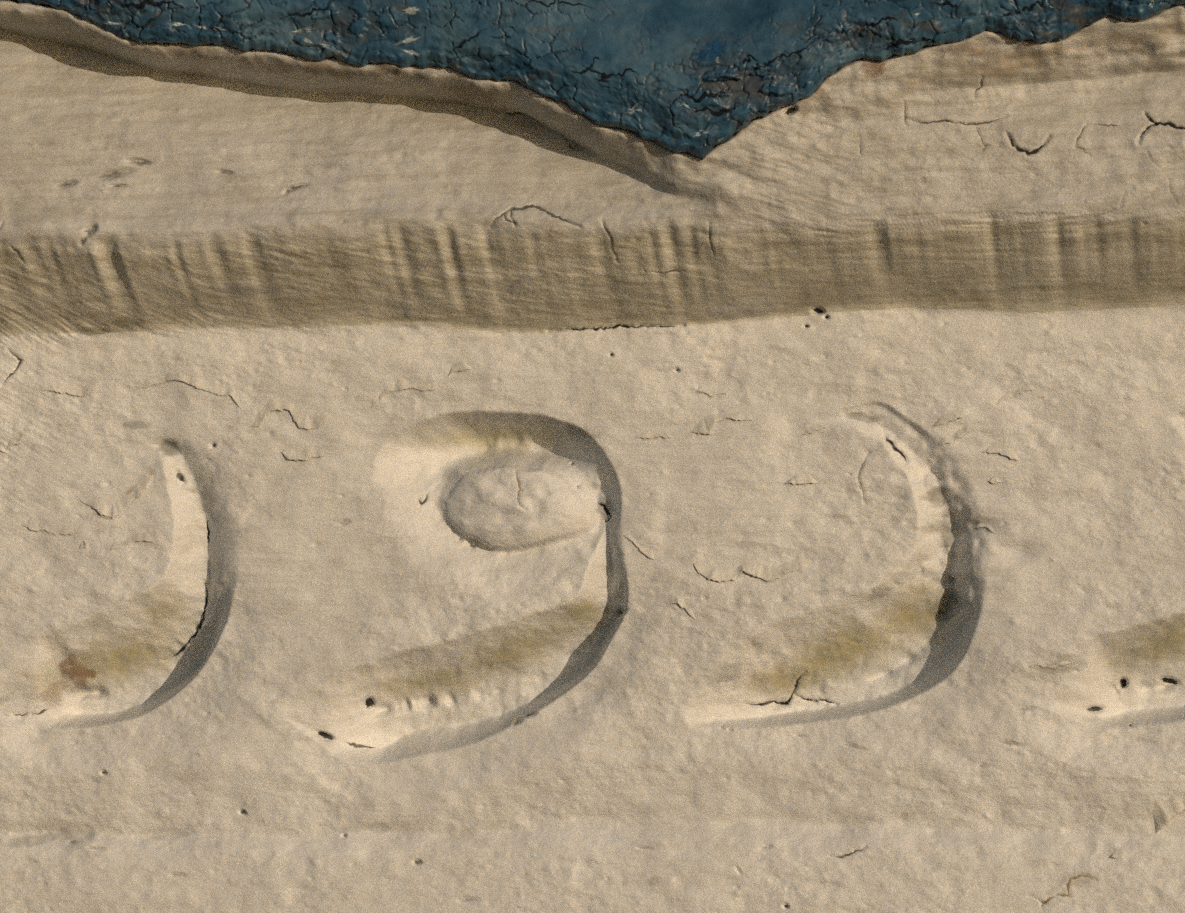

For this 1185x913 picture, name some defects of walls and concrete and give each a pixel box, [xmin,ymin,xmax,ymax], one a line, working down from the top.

crack [107,0,184,9]
crack [288,6,329,17]
crack [527,0,589,8]
crack [933,0,959,18]
crack [1001,0,1045,17]
crack [454,32,511,56]
crack [863,16,935,50]
crack [577,57,637,82]
crack [679,38,819,116]
crack [904,103,1046,155]
crack [1076,114,1185,200]
crack [496,205,574,225]